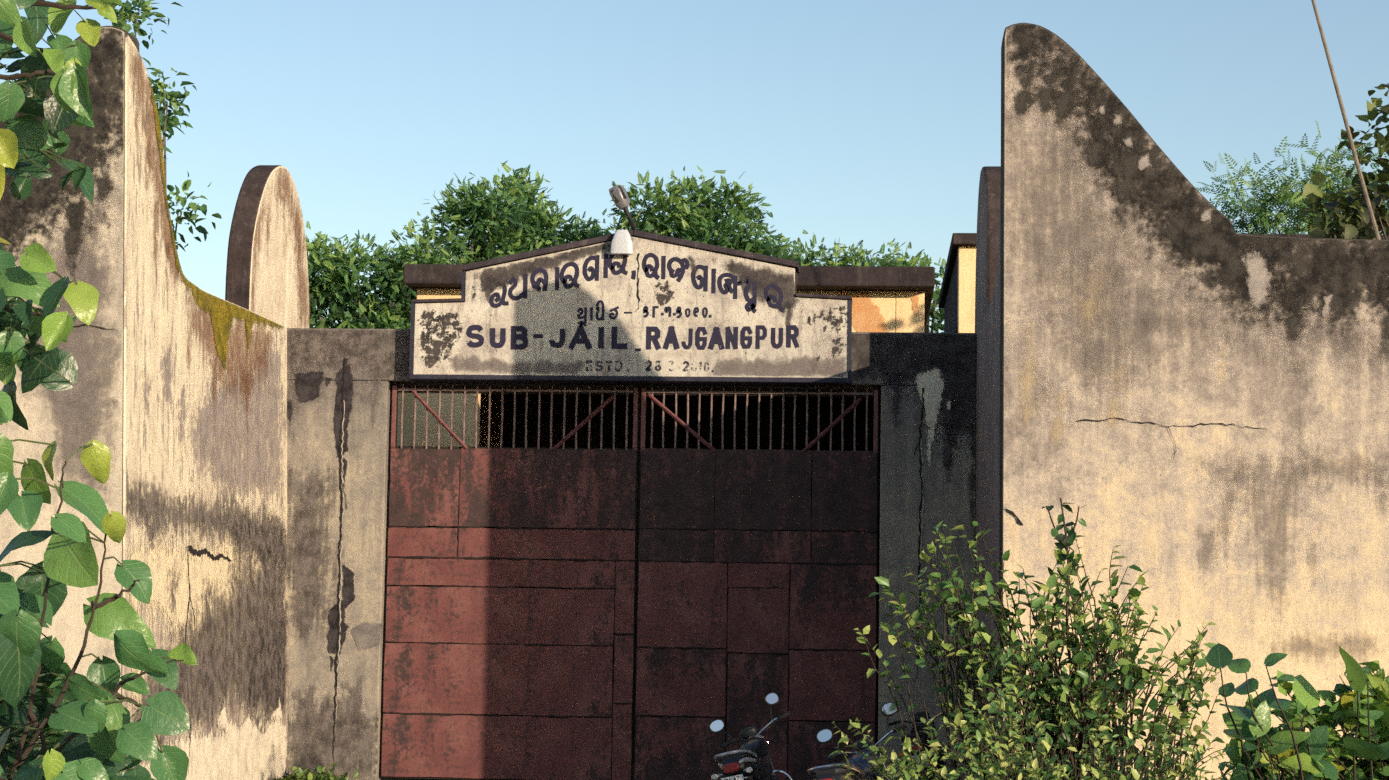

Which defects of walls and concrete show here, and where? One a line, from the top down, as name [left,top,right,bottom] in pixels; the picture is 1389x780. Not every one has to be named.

leakage [24,148,119,490]
leakage [126,329,410,780]
leakage [1015,59,1119,361]
crack [1078,418,1256,459]
leakage [1285,296,1305,340]
leakage [1380,289,1389,355]